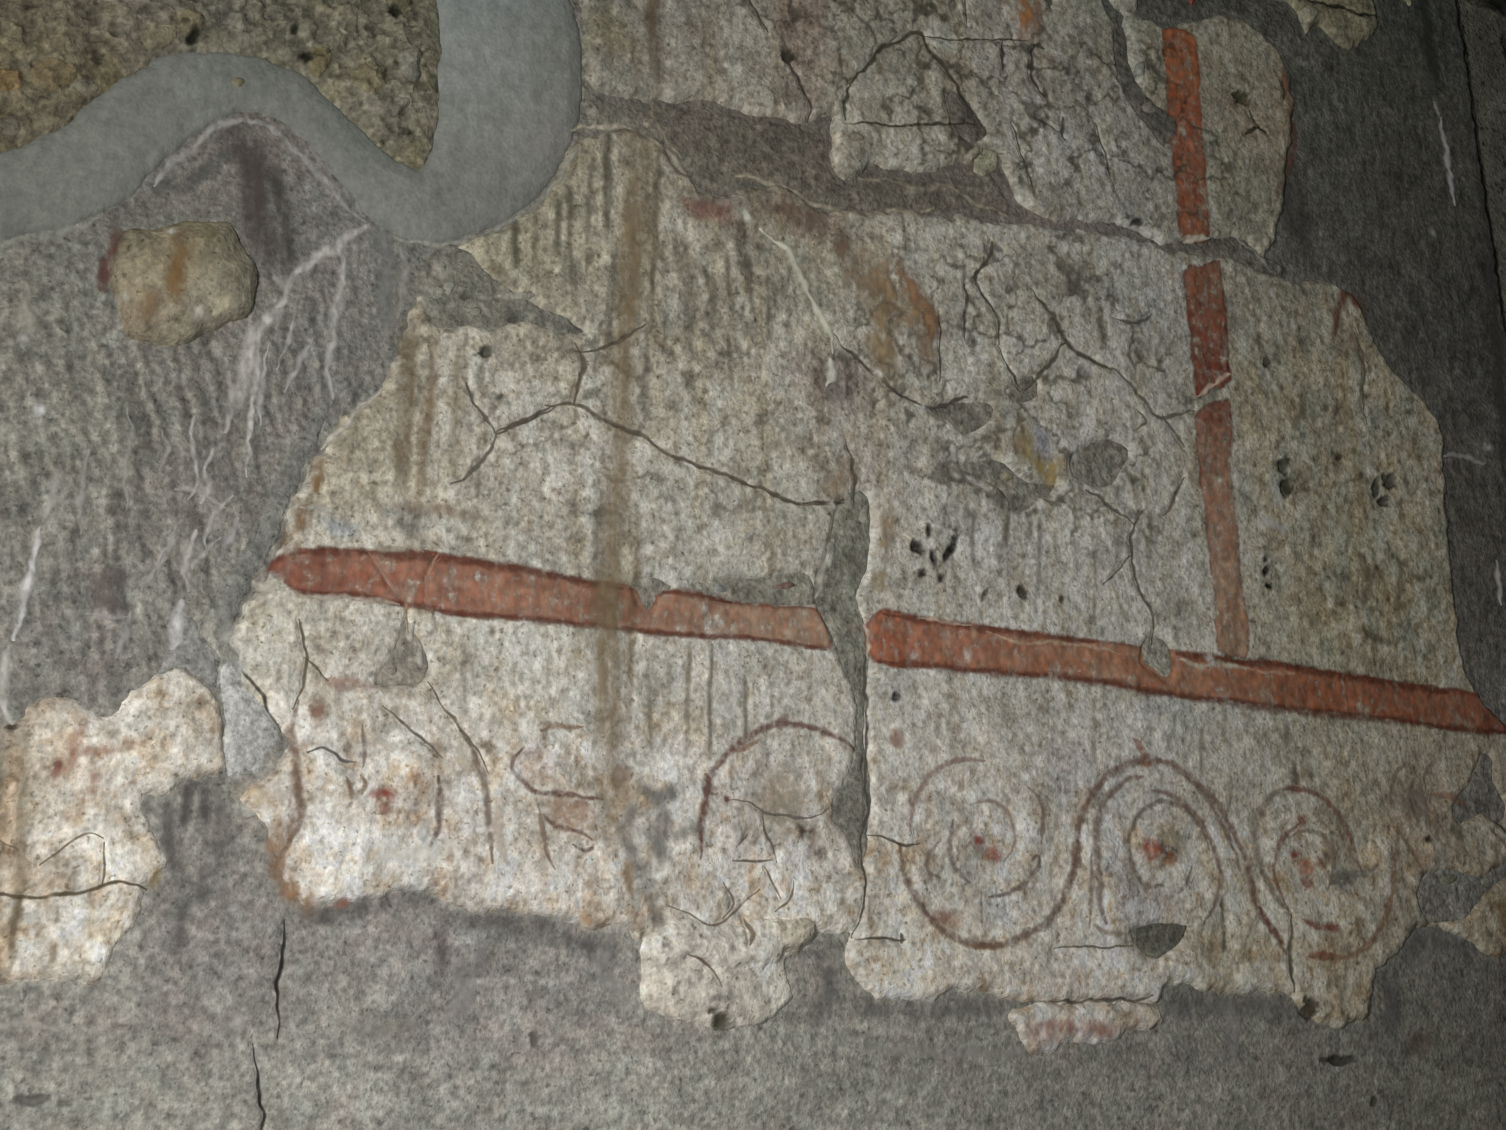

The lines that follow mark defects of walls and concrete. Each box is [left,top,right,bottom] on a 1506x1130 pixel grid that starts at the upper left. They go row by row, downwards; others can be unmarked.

spalling [0,0,442,170]
spalling [1114,22,1178,145]
leakage [735,140,1013,222]
leakage [153,118,577,478]
spalling [415,245,583,334]
leakage [141,415,239,650]
leakage [597,153,654,739]
crack [450,323,857,506]
crack [834,241,1195,646]
crack [233,618,356,763]
crack [252,919,285,1130]
spalling [1131,923,1187,959]